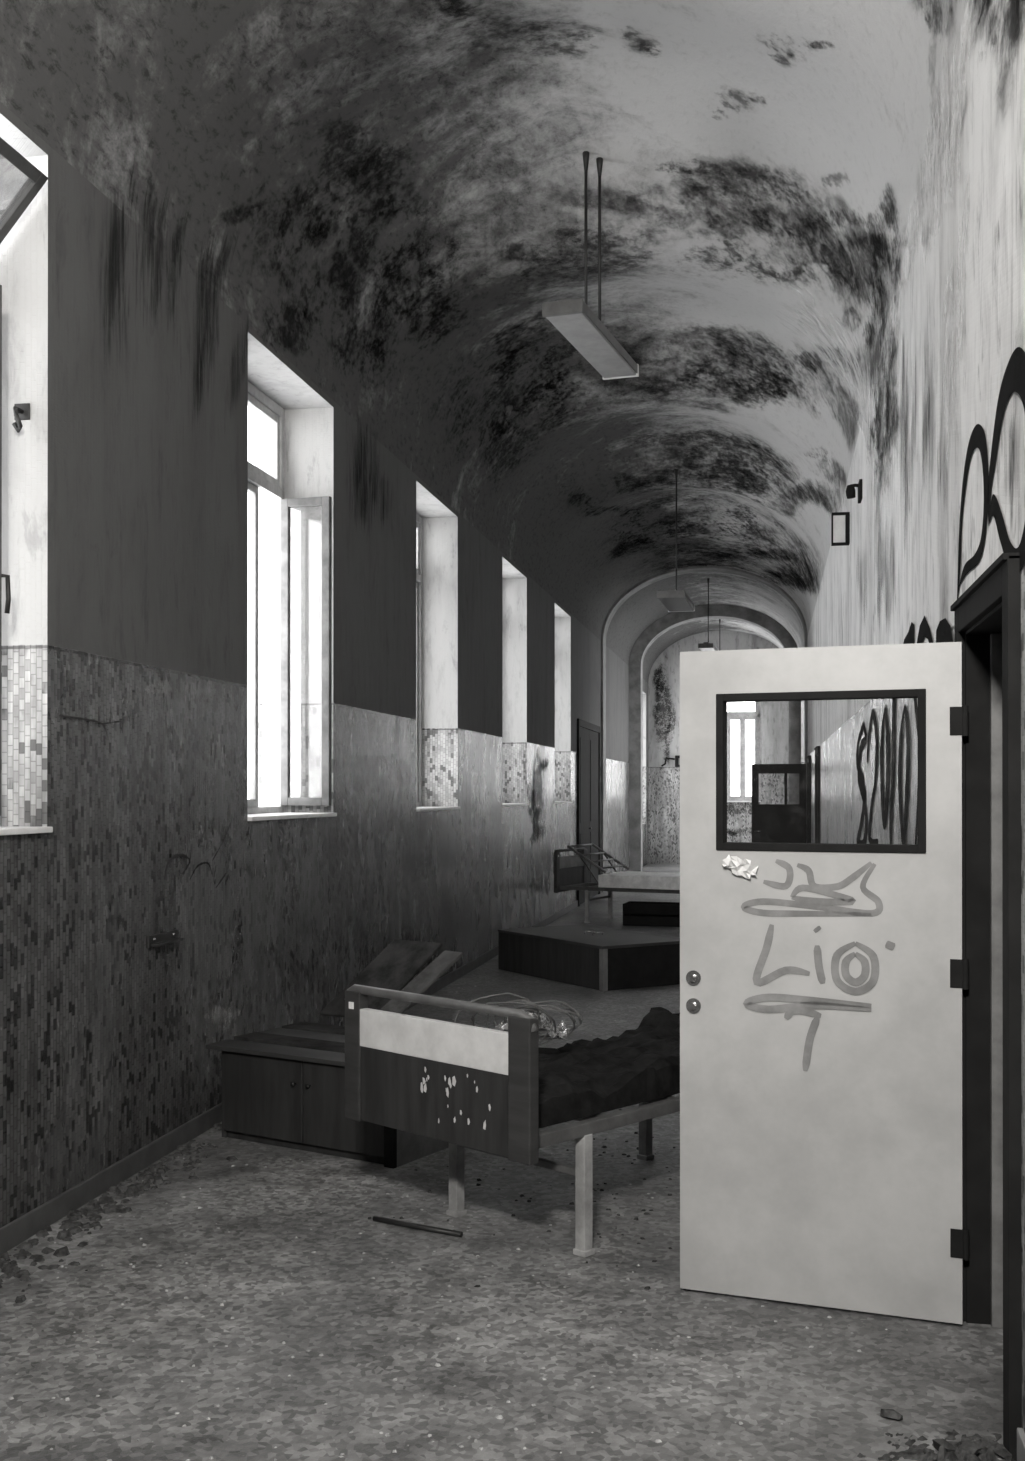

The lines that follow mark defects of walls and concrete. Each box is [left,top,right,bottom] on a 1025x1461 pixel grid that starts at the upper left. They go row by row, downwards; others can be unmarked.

damp [625,32,652,52]
damp [974,0,1022,54]
damp [108,208,125,340]
damp [251,121,464,382]
damp [442,316,576,468]
damp [506,235,640,276]
damp [597,190,640,214]
damp [640,162,945,495]
damp [569,431,840,592]
damp [860,542,894,627]